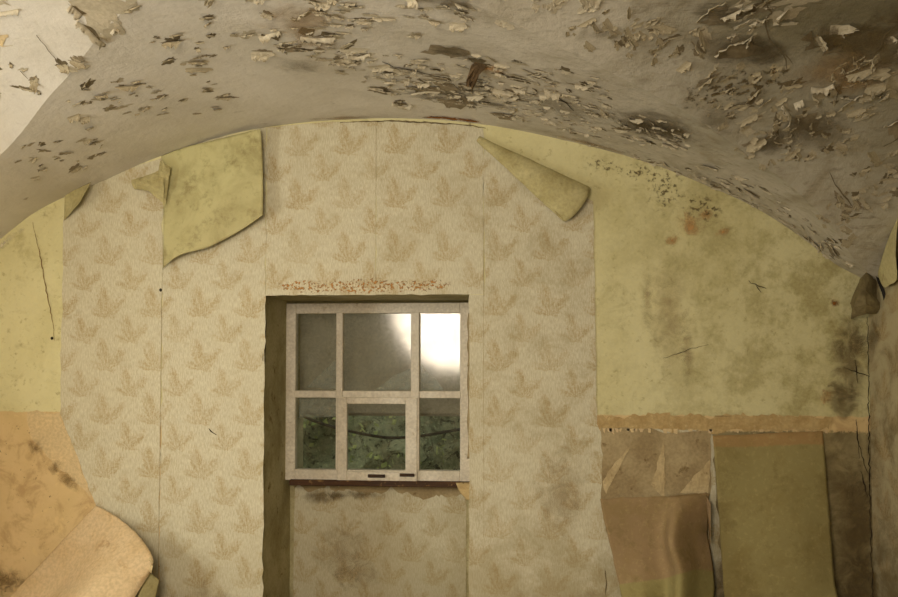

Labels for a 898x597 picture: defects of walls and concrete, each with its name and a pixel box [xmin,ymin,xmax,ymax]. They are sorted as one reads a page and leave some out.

peeling [67,0,142,50]
peeling [0,62,42,95]
water stain [686,39,788,108]
peeling [15,55,169,180]
peeling [150,0,898,268]
water stain [632,117,680,135]
crack [33,227,54,334]
corrosion [282,278,447,293]
water stain [835,326,878,406]